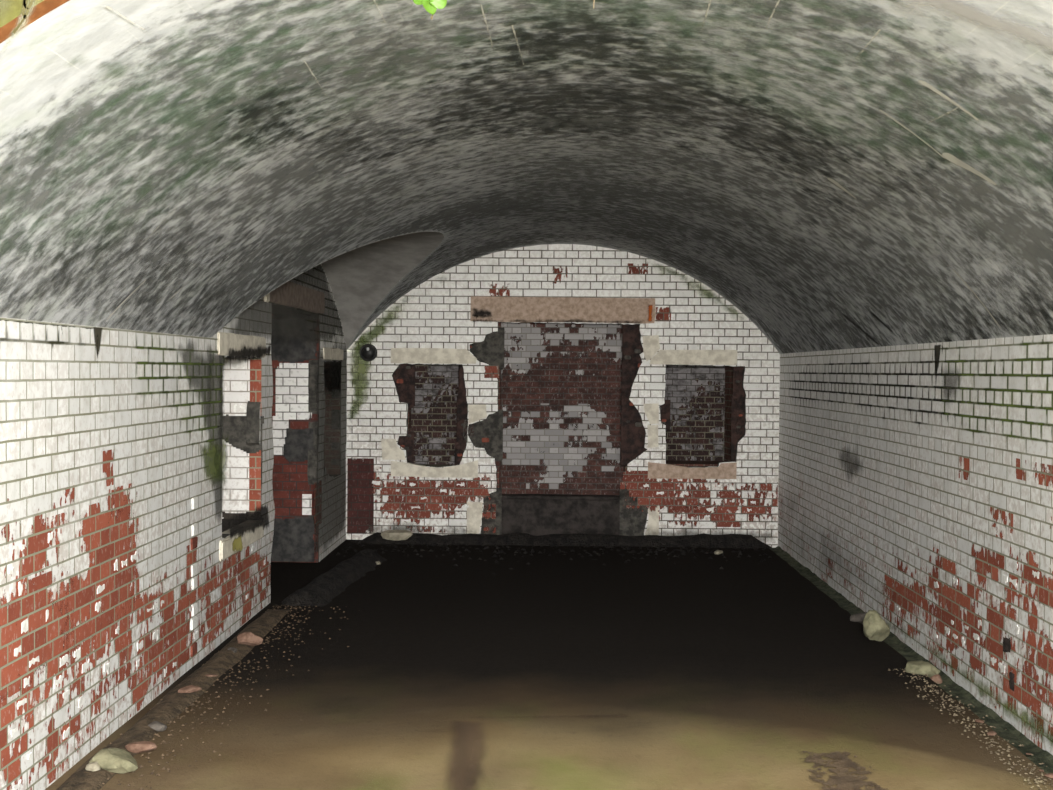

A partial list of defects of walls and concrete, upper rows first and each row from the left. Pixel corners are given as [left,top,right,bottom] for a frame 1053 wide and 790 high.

leakage [0,0,1053,554]
peeling [484,322,622,378]
spalling [347,458,496,534]
spalling [411,364,458,465]
peeling [502,403,778,527]
spalling [665,378,725,461]
spalling [959,457,970,480]
spalling [1016,458,1053,486]
spalling [0,449,270,790]
spalling [881,505,1053,732]